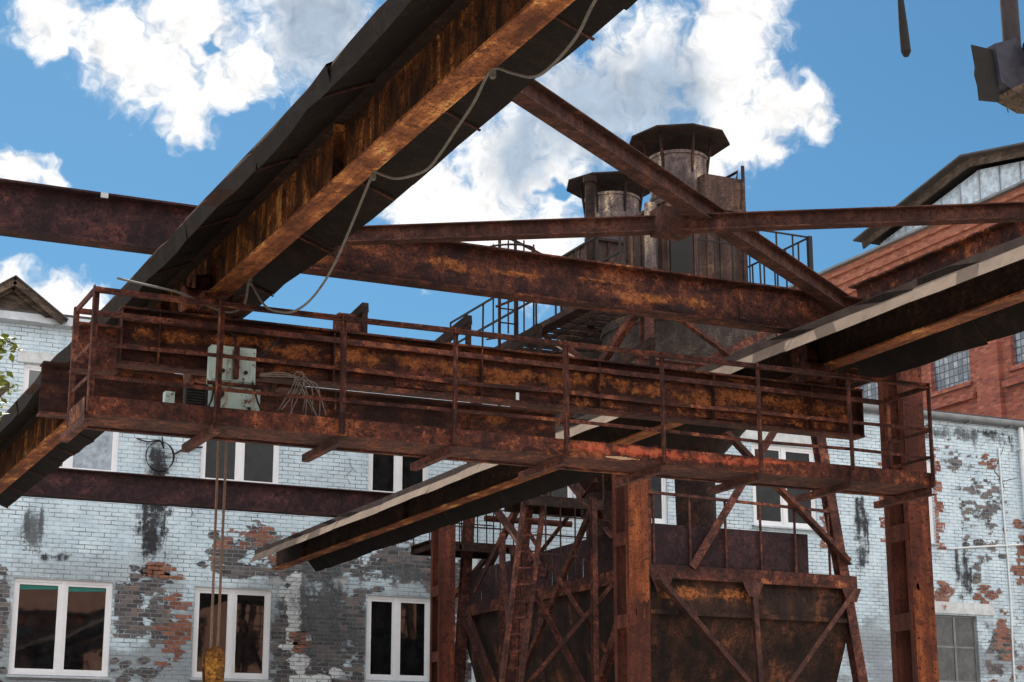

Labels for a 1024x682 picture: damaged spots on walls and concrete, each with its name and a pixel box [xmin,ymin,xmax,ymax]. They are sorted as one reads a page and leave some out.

rust [394,357,660,412]
rust [674,387,848,430]
leakage [148,448,170,475]
leakage [20,508,69,561]
peeling [110,562,192,682]
leakage [133,505,172,563]
peeling [196,518,431,682]
rust [628,479,705,618]
leakage [854,497,869,569]
rust [913,573,946,682]
leakage [954,542,973,598]
spalling [925,424,1024,682]